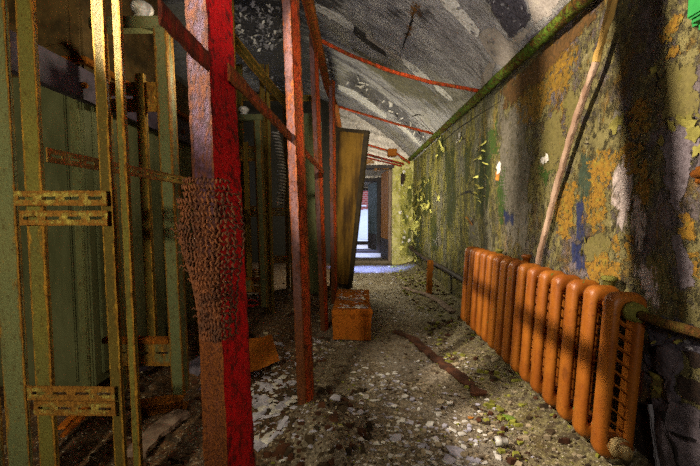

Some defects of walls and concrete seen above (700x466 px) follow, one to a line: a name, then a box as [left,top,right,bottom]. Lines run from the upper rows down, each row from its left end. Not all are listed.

water stain [315,0,344,13]
flaking render [463,0,564,86]
water stain [500,9,597,109]
water stain [445,143,456,228]
water stain [480,122,499,217]
flaking render [472,30,583,251]
peeling [554,97,700,328]
water stain [611,154,647,250]
flaking render [658,12,700,290]
flaking render [633,322,700,465]